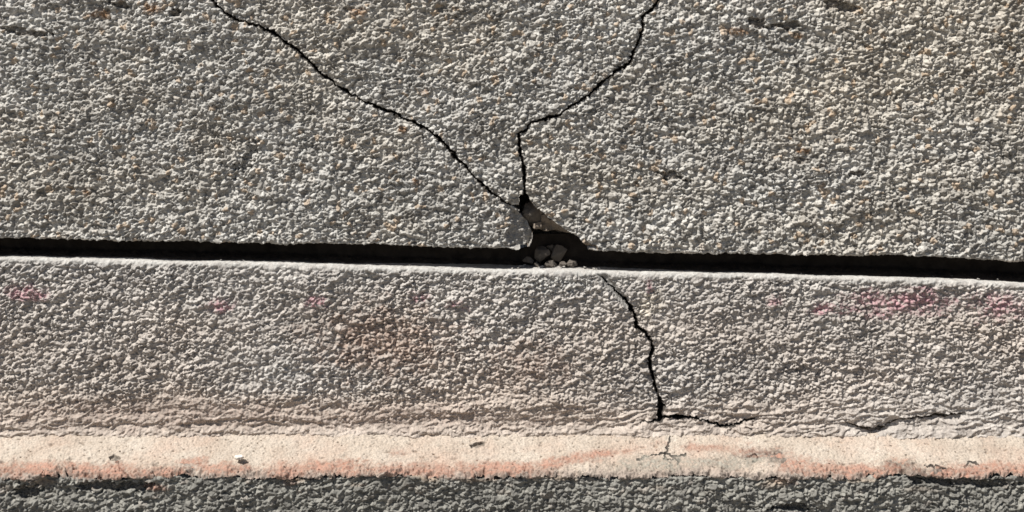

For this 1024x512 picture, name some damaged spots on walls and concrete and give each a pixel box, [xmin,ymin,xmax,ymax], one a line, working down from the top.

crack [211,0,660,209]
spalling [504,194,599,250]
crack [595,273,755,465]
crack [846,412,963,431]